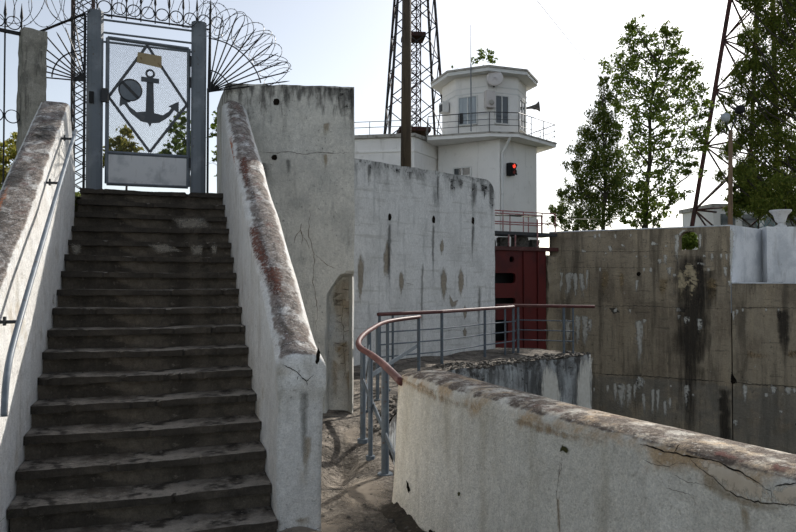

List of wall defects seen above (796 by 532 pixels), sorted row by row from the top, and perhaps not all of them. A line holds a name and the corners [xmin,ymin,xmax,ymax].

damp [318,88,353,117]
corrosion [230,136,251,188]
corrosion [249,226,284,304]
crack [287,215,331,342]
damp [560,270,588,295]
damp [561,315,592,343]
damp [635,229,734,423]
damp [777,309,789,349]
damp [606,376,671,415]
crack [640,443,796,506]